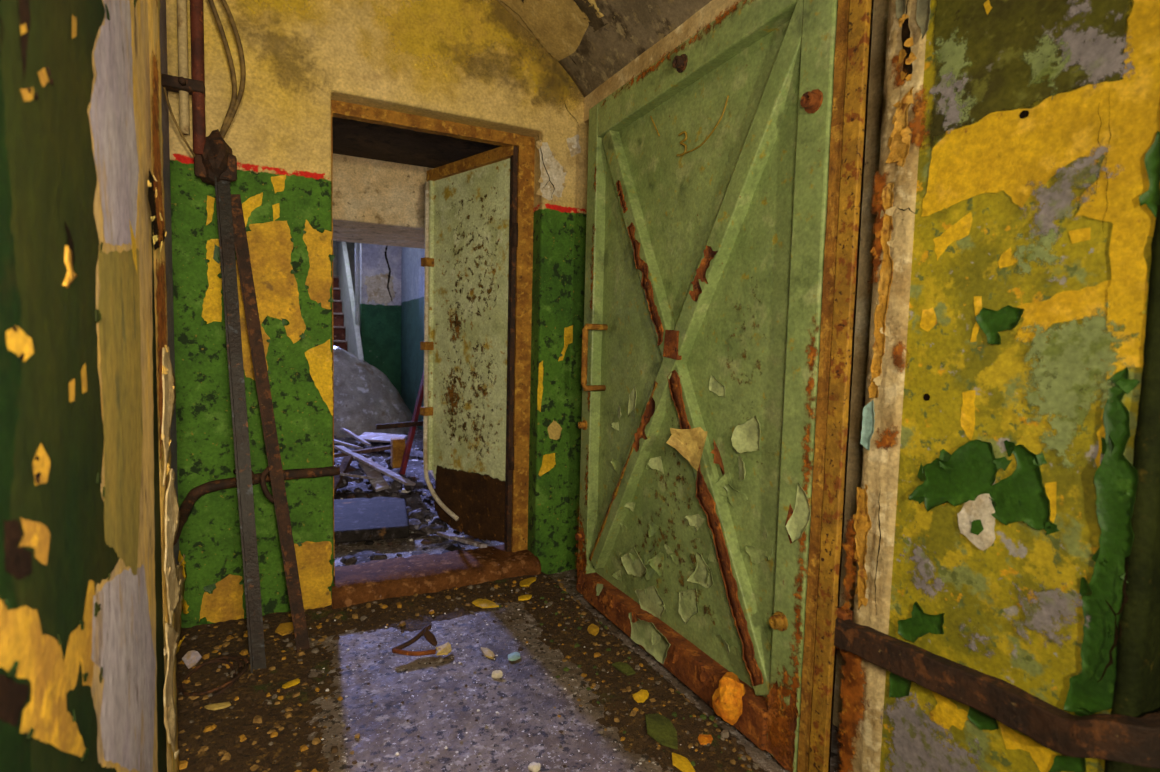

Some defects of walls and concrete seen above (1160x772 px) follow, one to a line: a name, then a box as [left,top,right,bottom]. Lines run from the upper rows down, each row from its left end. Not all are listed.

damp [381,0,583,102]
damp [573,0,616,31]
peeling [0,0,244,772]
peeling [236,174,335,416]
corrosion [616,180,664,346]
corrosion [689,245,718,302]
peeling [909,0,1160,717]
corrosion [575,370,691,595]
peeling [294,541,335,610]
corrosion [696,464,807,772]
corrosion [838,650,870,772]
peeling [930,691,1086,772]